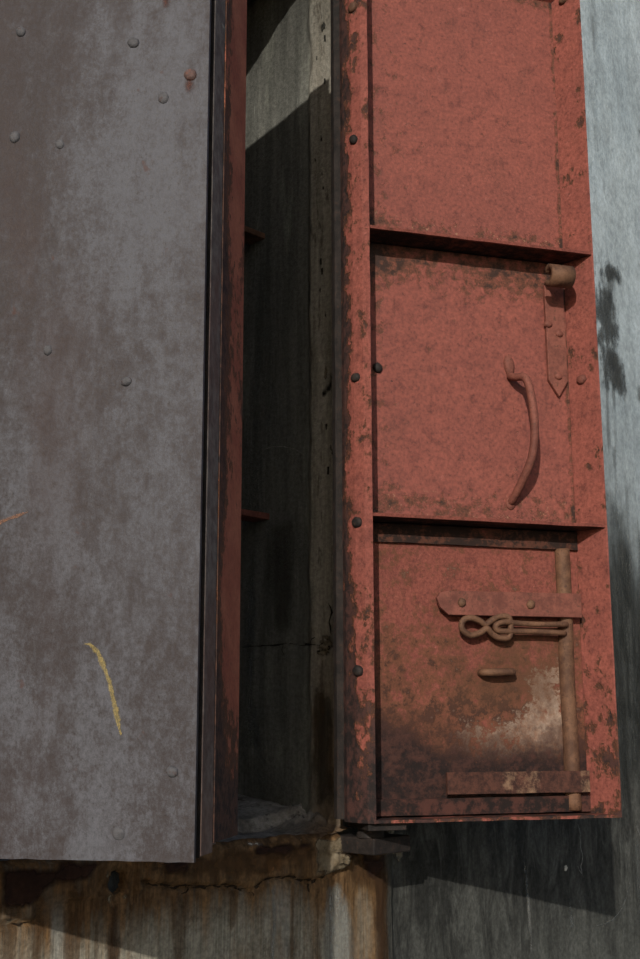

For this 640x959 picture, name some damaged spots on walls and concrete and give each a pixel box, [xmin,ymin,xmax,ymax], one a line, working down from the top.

leakage [595,264,625,396]
rust [3,862,98,907]
rust [144,843,314,881]
crack [144,871,336,896]
rust [108,907,119,959]